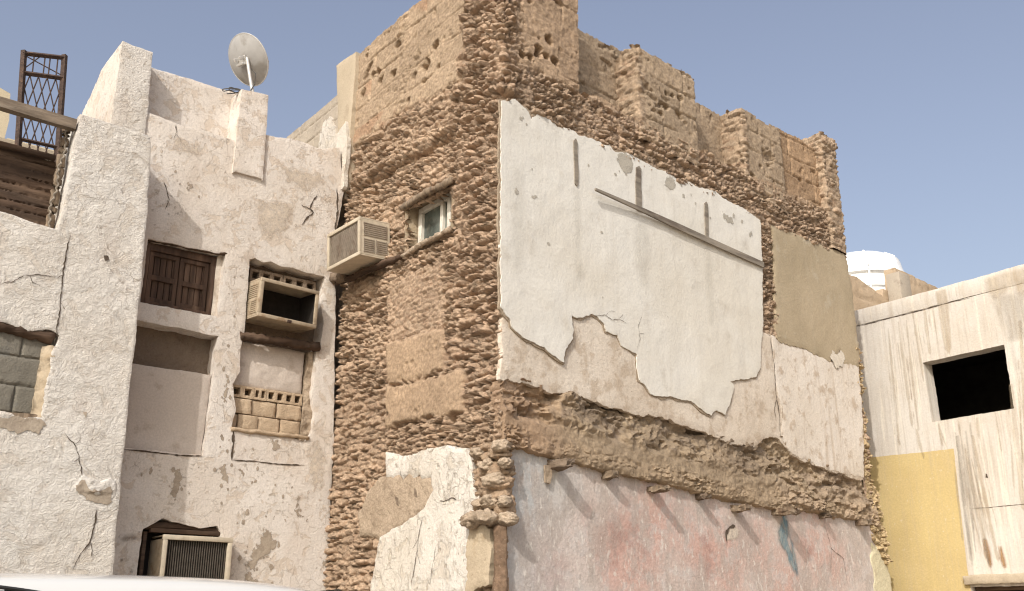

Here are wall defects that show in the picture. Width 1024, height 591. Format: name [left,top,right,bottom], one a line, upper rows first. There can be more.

crack [301,191,339,230]
crack [2,234,71,335]
peeling [496,99,864,481]
crack [73,511,97,569]
peeling [370,445,481,591]